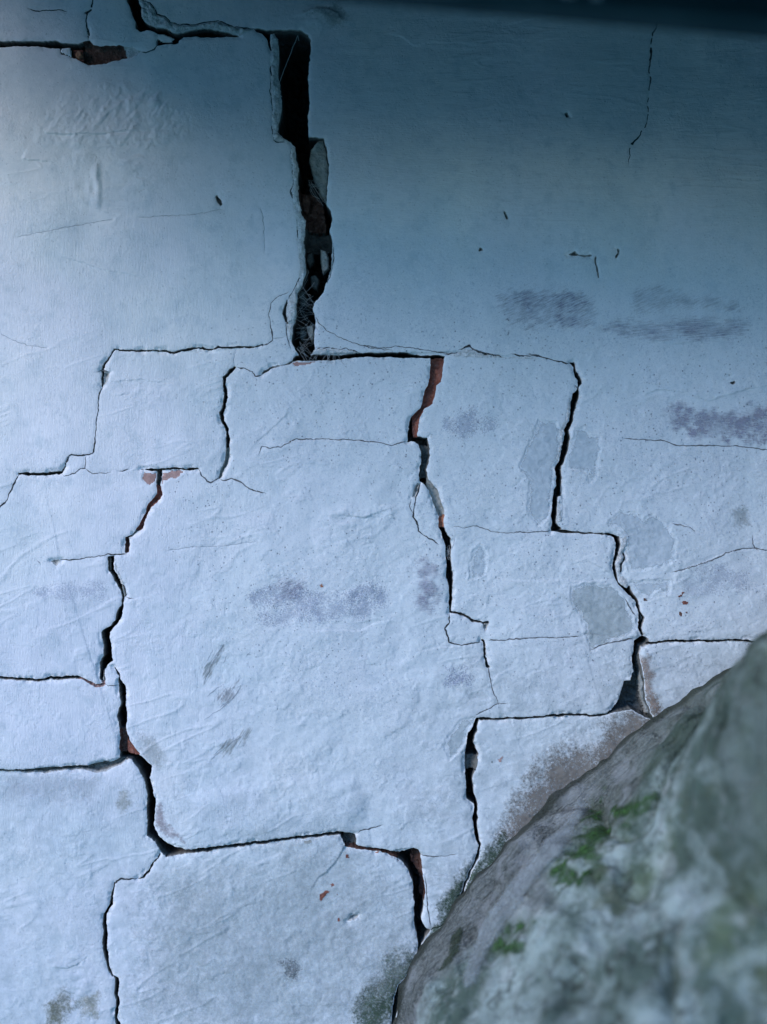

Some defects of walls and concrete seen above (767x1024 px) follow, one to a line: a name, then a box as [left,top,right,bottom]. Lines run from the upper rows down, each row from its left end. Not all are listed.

crack [628,29,656,162]
crack [0,0,568,1024]
crack [510,362,645,636]
crack [591,633,632,650]
crack [464,711,610,889]